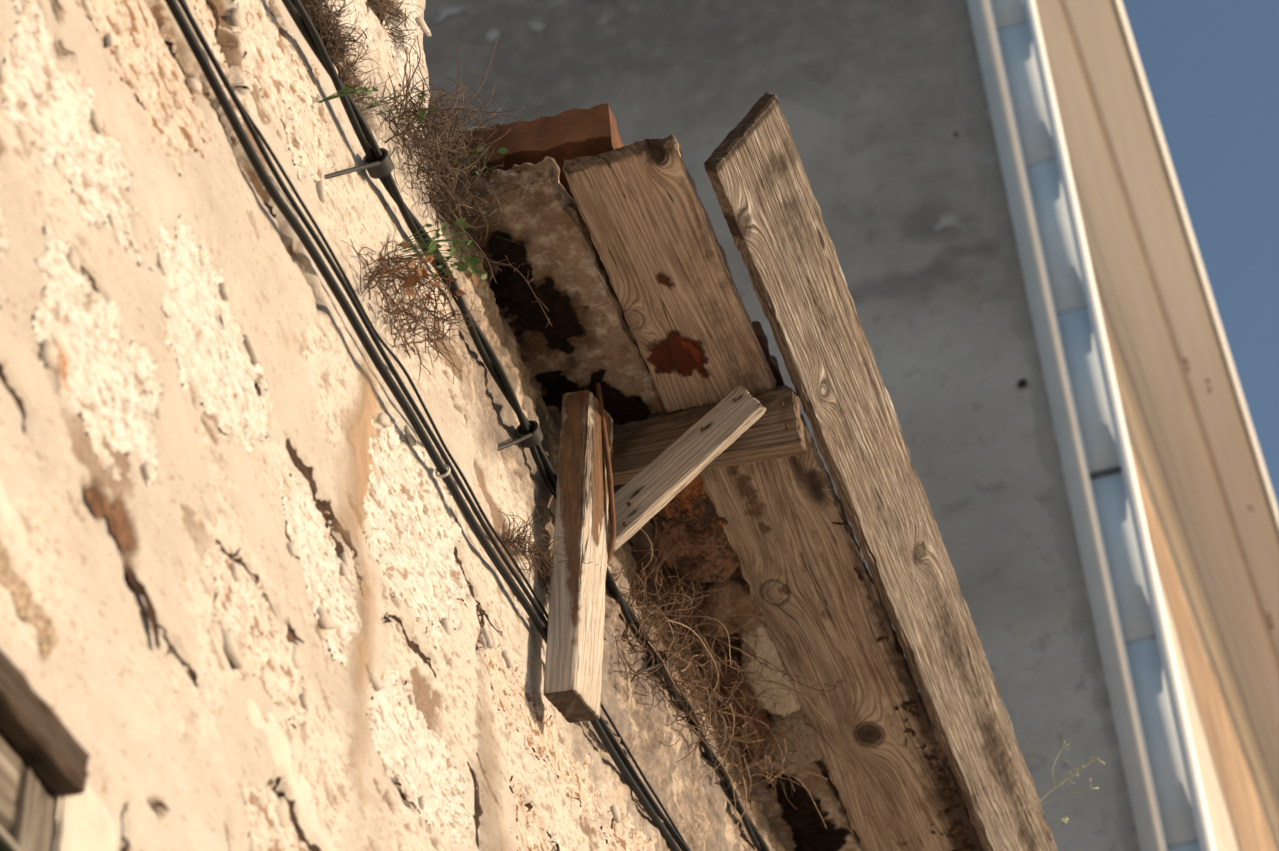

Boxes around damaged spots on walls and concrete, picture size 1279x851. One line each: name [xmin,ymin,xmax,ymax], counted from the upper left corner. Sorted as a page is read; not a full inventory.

spalling [0,0,272,487]
flaking render [0,542,59,660]
crack [126,568,198,688]
spalling [280,473,363,667]
spalling [362,412,470,651]
crack [120,801,170,851]
spalling [365,662,473,845]